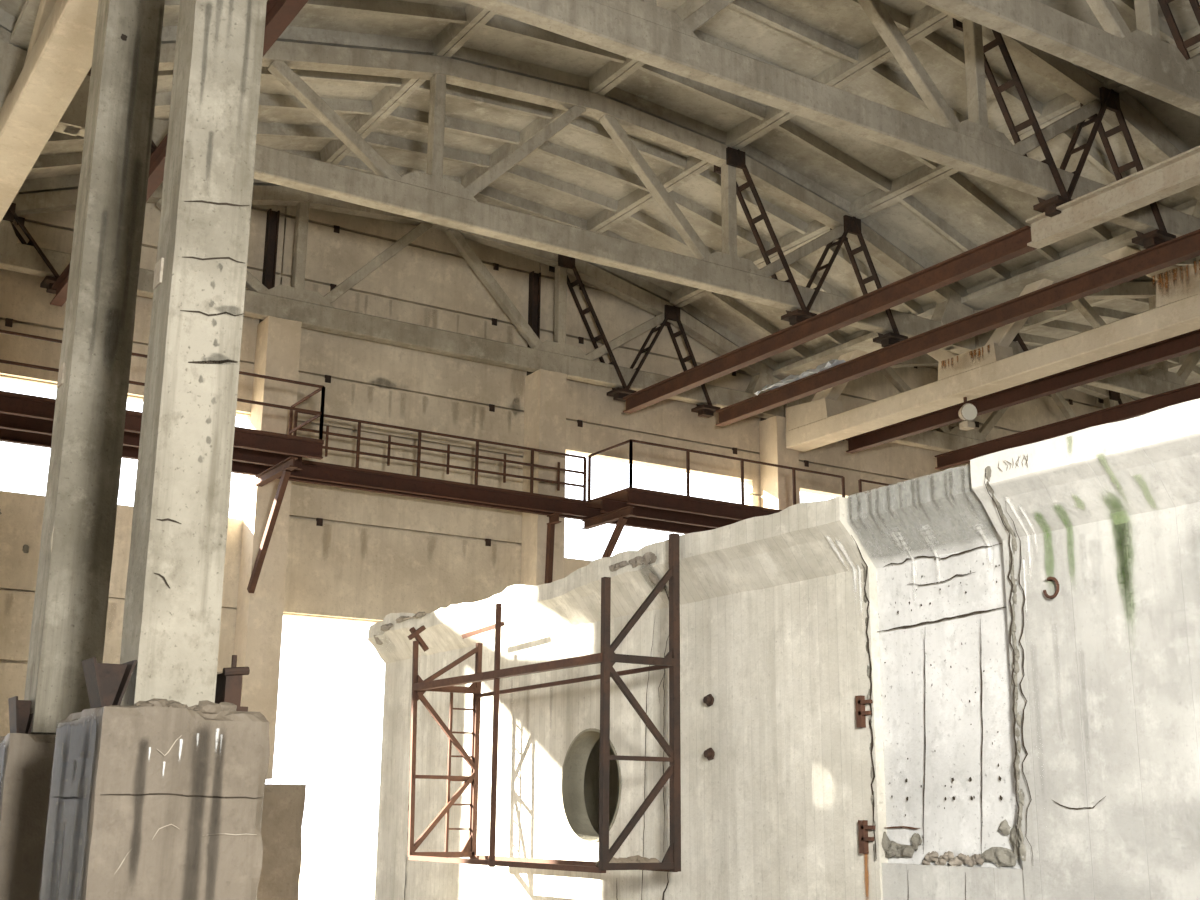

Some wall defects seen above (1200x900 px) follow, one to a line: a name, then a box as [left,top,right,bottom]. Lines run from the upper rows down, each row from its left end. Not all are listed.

crack [184,199,250,207]
crack [185,256,244,264]
corrosion [1151,260,1200,291]
crack [180,309,244,317]
crack [188,357,237,365]
damp [1055,506,1074,569]
damp [1099,456,1133,614]
damp [1006,499,1053,612]
spalling [851,466,1033,867]